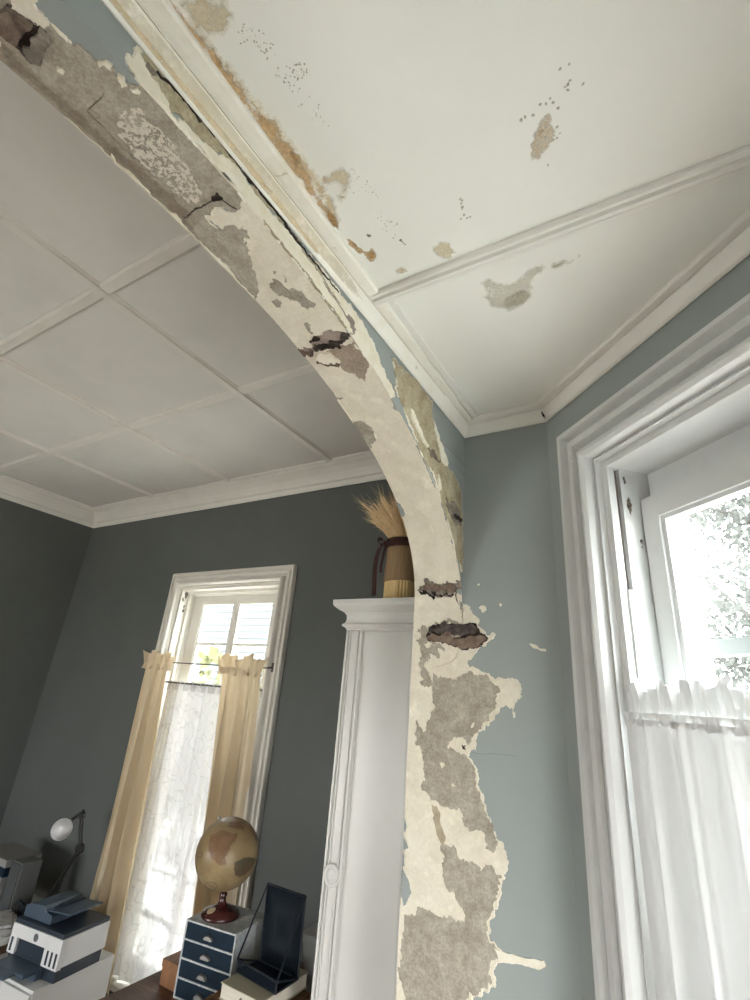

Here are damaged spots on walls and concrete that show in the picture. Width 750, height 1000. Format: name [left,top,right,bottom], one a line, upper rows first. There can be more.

water stain [109,0,329,254]
crack [135,0,445,395]
spalling [0,0,546,1000]